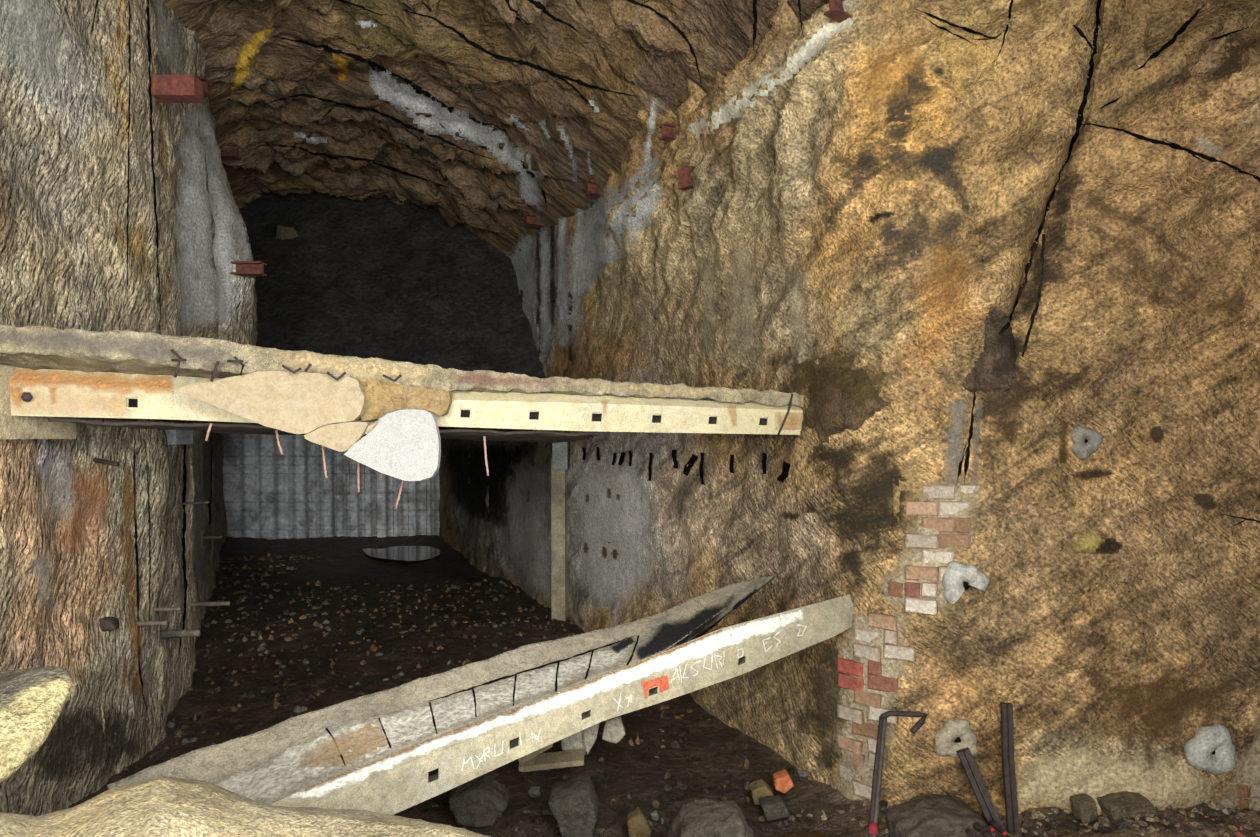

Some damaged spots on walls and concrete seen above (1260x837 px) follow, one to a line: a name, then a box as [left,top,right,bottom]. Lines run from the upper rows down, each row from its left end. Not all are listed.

crack [915,0,1013,65]
damp [371,69,592,207]
damp [645,99,656,160]
crack [998,0,1260,356]
damp [507,209,584,360]
damp [772,272,895,404]
rust [9,369,172,410]
crack [956,391,976,486]
crack [1222,514,1260,527]
flaking render [834,470,980,801]
flaking render [1220,725,1260,811]